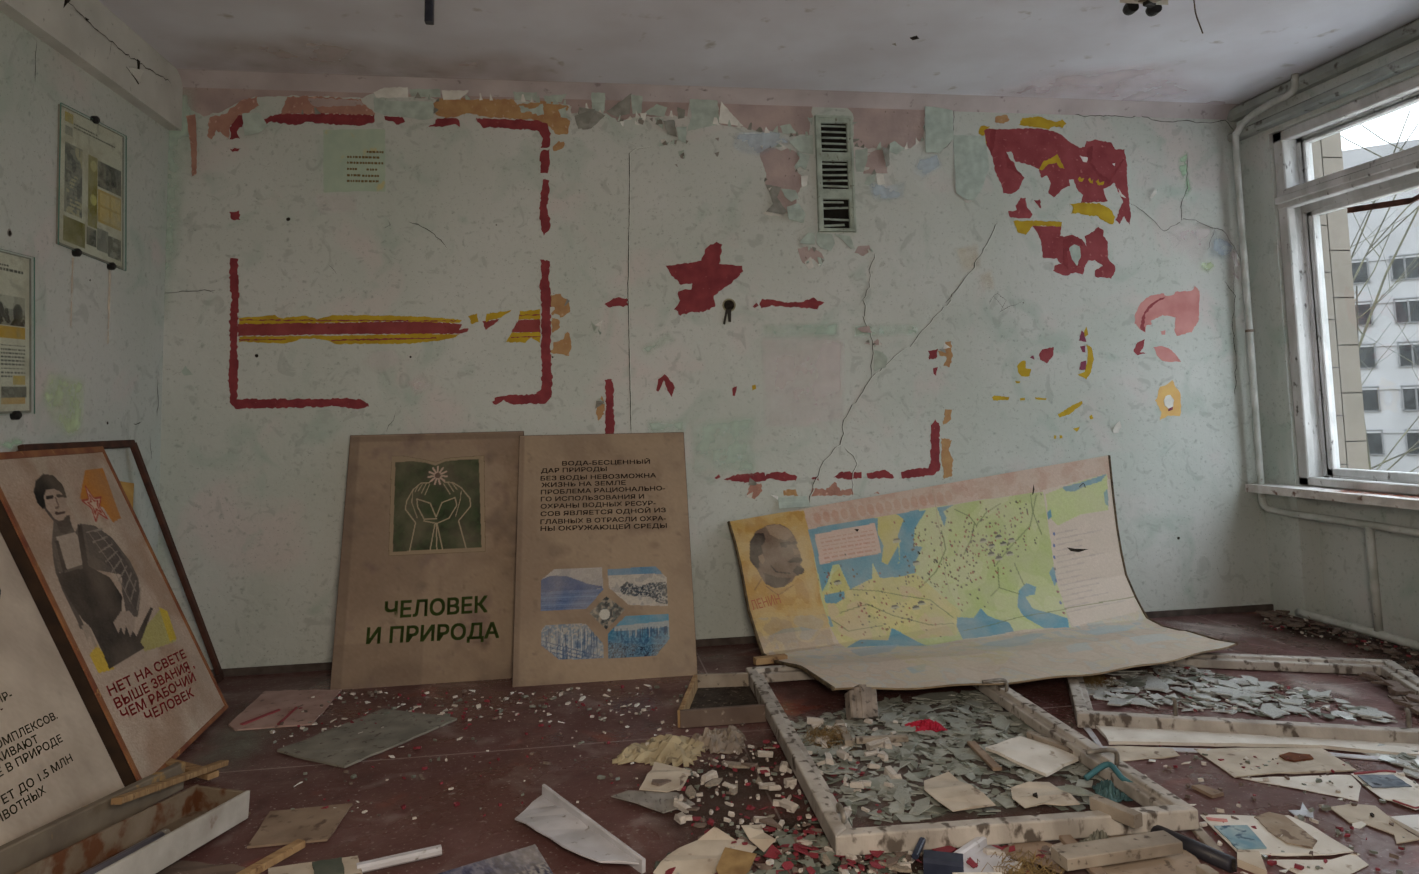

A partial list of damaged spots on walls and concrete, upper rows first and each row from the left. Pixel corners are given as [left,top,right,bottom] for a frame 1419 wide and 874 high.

crack [66,0,170,82]
peeling [183,87,873,269]
peeling [848,106,989,203]
crack [809,223,1017,502]